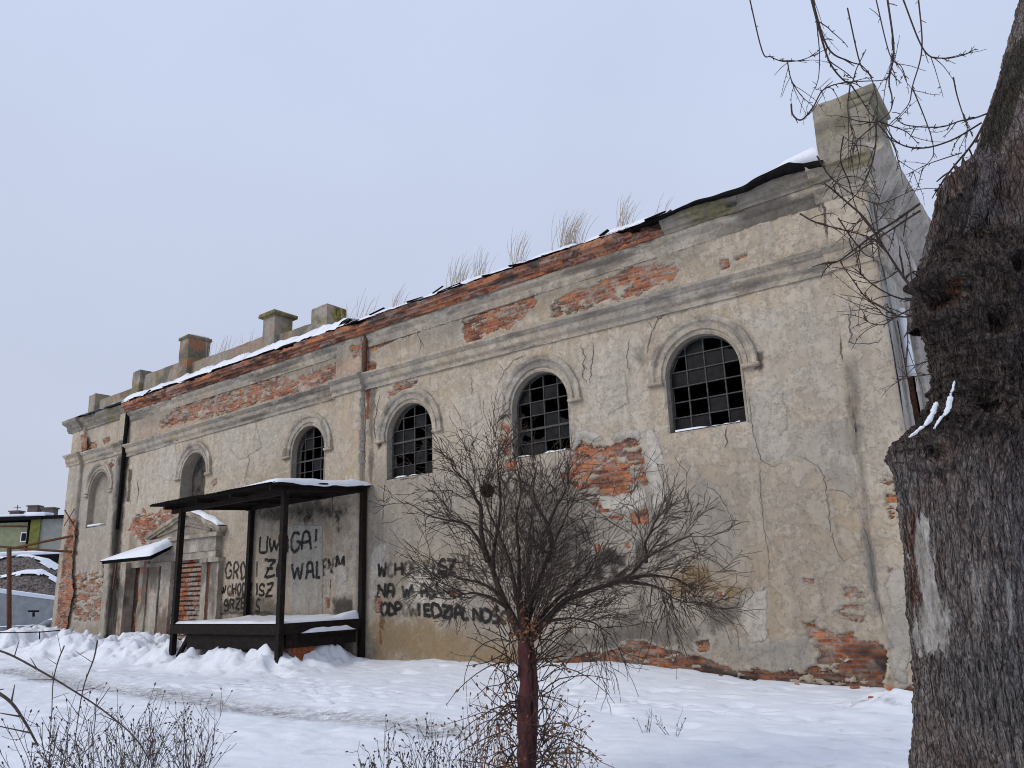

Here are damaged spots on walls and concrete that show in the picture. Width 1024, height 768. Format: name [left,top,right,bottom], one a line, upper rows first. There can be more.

flaking render [460,293,537,343]
flaking render [551,262,679,318]
flaking render [161,363,336,429]
crack [580,345,594,385]
flaking render [560,428,665,525]
flaking render [128,508,176,546]
crack [703,393,884,641]
flaking render [54,517,104,631]
flaking render [553,566,914,691]